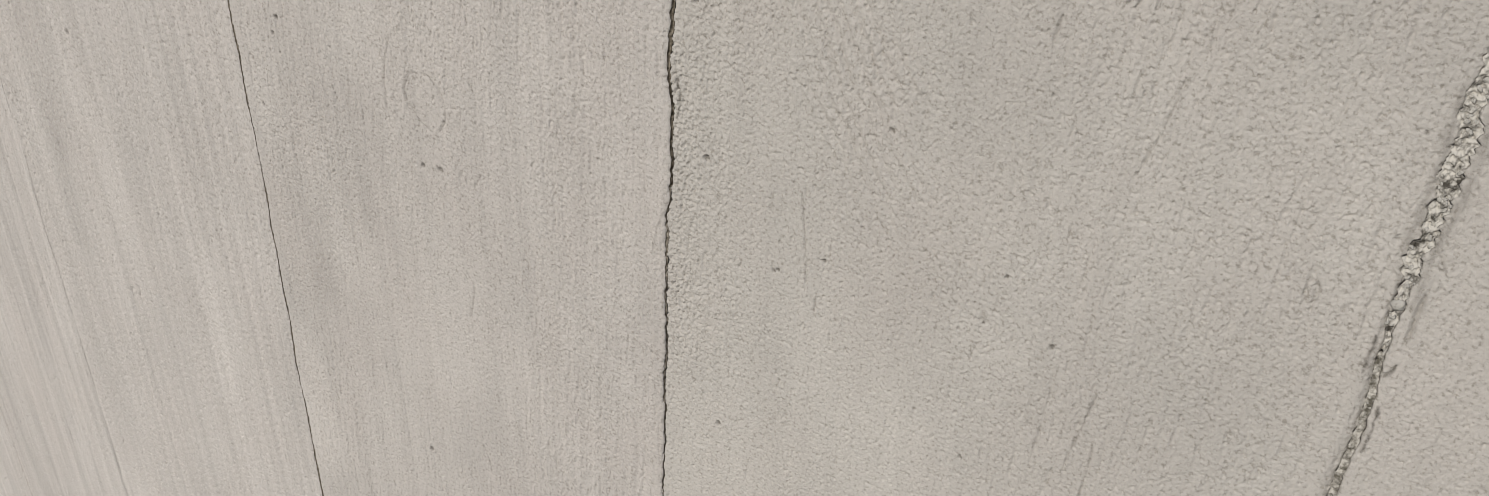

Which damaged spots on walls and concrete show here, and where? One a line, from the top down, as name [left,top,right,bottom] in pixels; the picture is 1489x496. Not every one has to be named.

crack [662,0,680,496]